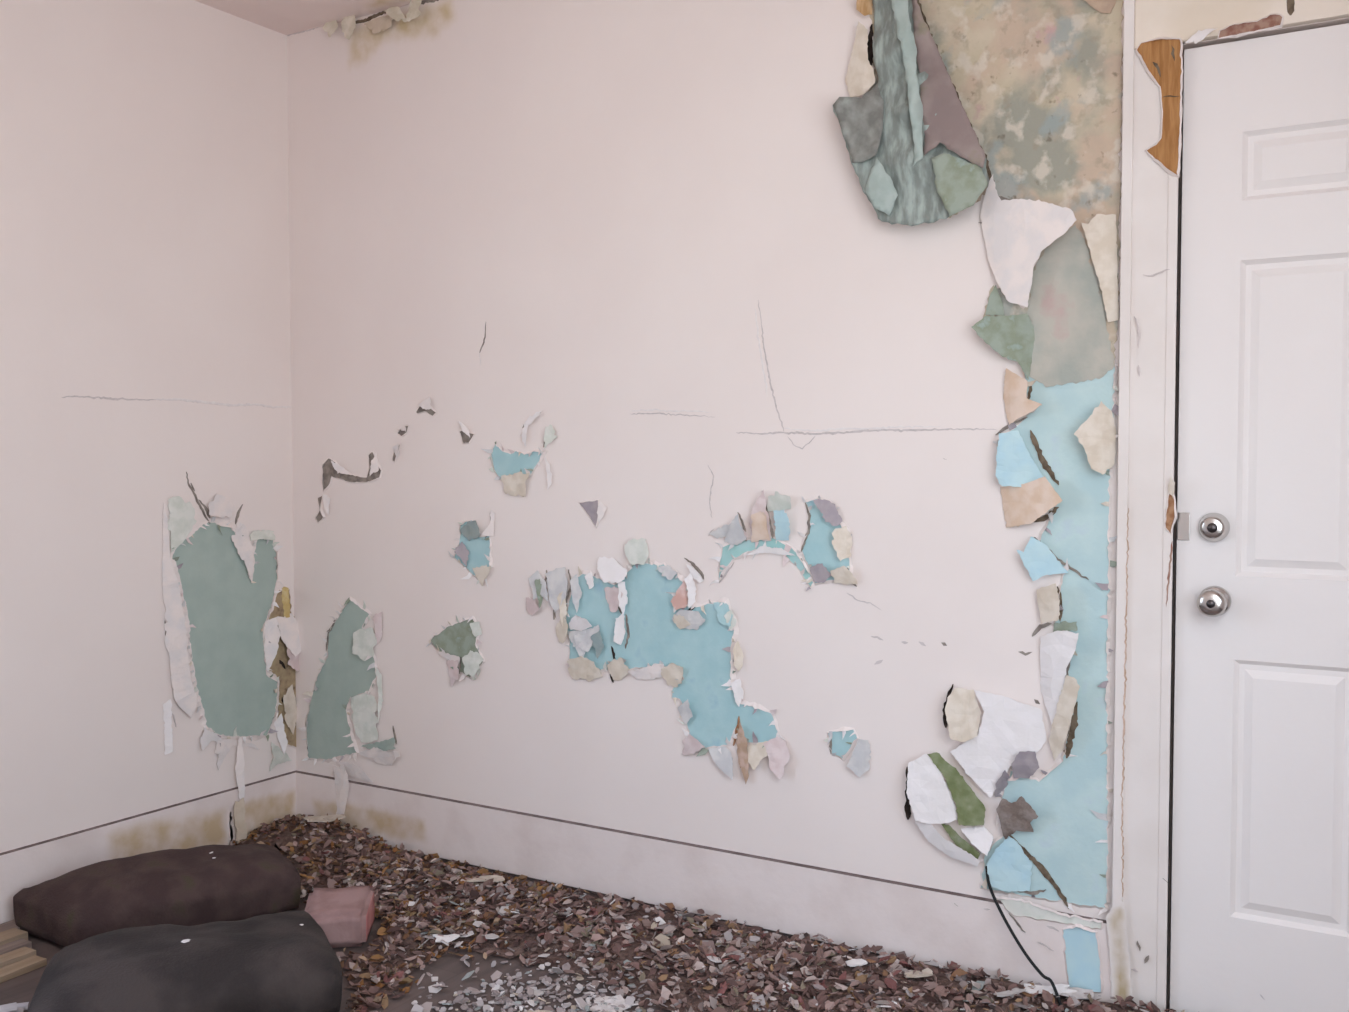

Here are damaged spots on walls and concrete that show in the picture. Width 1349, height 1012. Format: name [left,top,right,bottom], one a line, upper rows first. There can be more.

damp [343,0,460,76]
peeling [458,411,556,497]
crack [736,300,1089,636]
peeling [448,510,495,587]
peeling [162,472,400,844]
peeling [426,616,485,687]
peeling [526,490,879,784]
crack [942,684,953,728]
crack [1063,661,1078,758]
crack [903,767,911,820]
crack [1009,835,1069,909]
peeling [982,878,1108,993]